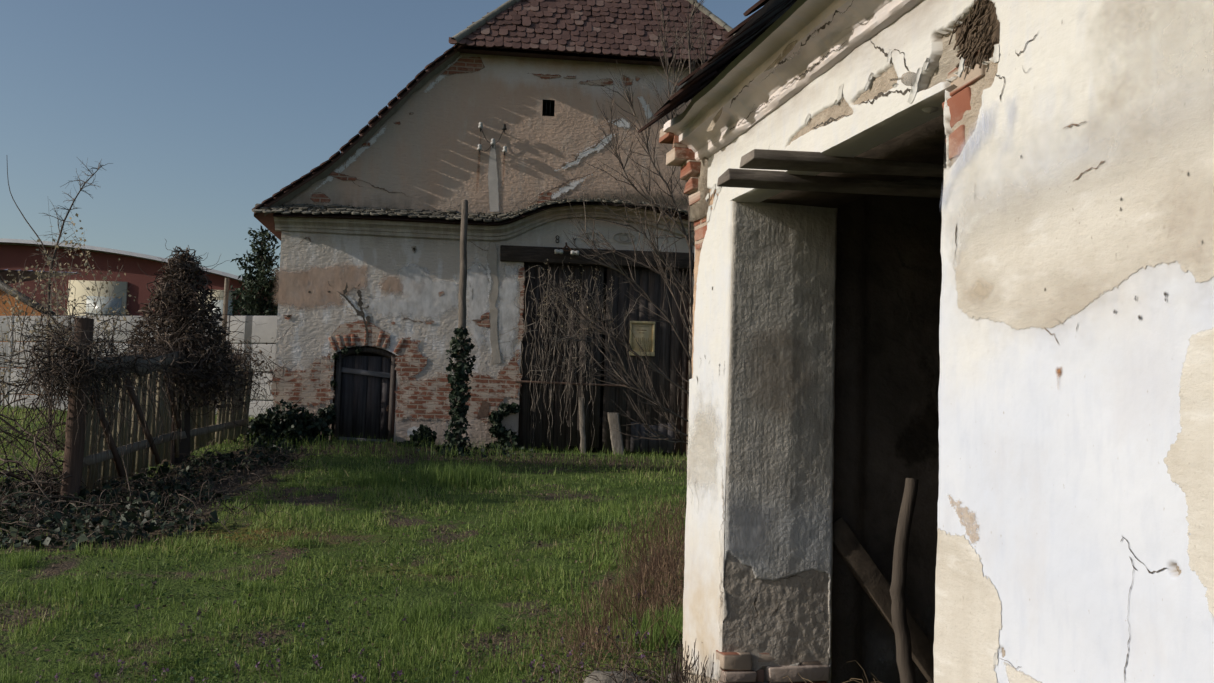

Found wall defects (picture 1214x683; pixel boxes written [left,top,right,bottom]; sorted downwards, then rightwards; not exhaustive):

spalling [423,55,485,93]
peeling [537,116,630,204]
peeling [533,74,653,119]
spalling [789,49,930,145]
spalling [942,44,1000,166]
peeling [268,248,525,436]
peeling [1164,328,1214,617]
peeling [684,552,830,683]
peeling [930,495,1019,683]
crack [1120,536,1165,682]